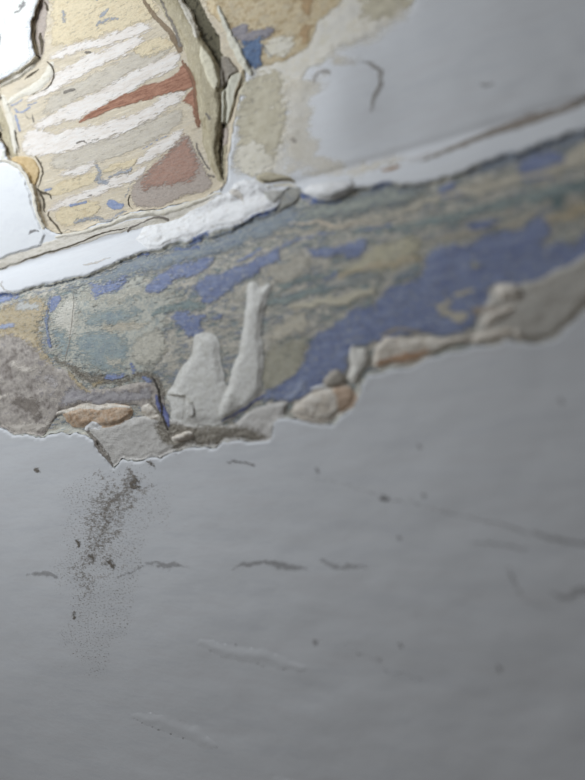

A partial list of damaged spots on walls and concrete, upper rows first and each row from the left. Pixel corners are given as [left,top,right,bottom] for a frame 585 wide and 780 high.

peeling [0,0,585,468]
crack [351,61,383,107]